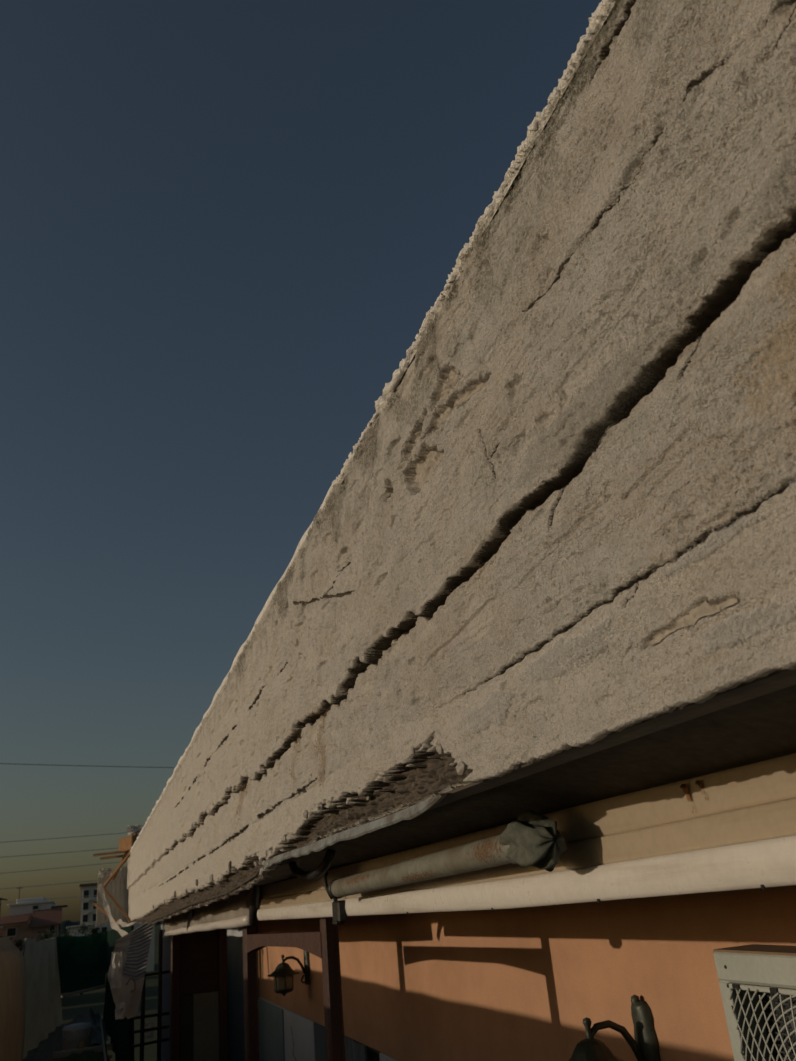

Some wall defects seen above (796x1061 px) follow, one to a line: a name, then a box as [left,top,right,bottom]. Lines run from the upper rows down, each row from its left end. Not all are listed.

spalling [132,743,473,925]
crack [162,215,796,884]